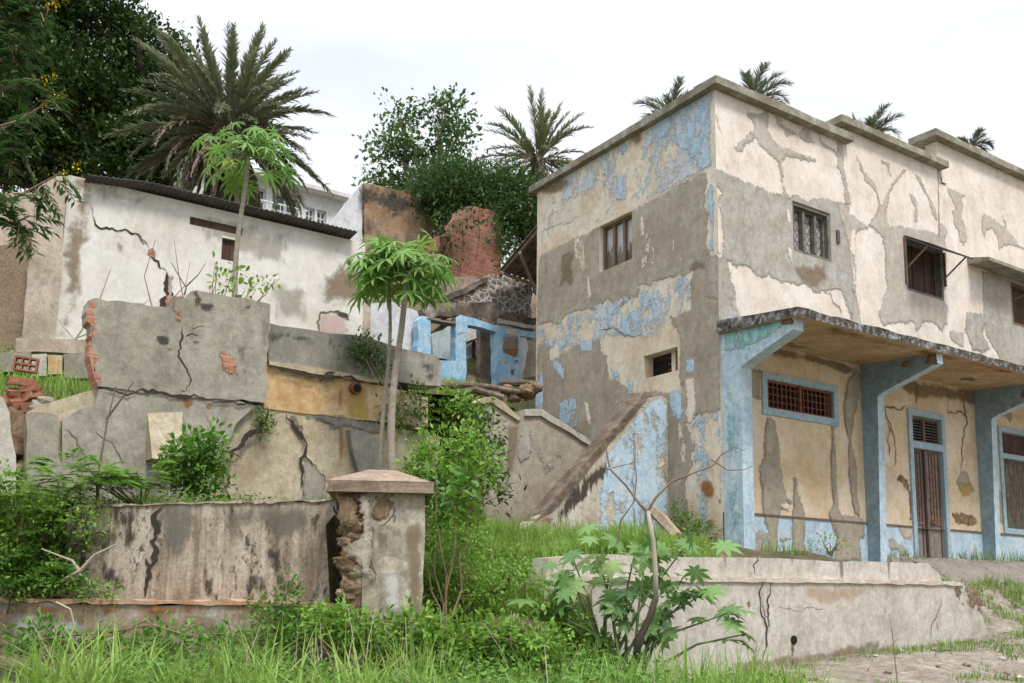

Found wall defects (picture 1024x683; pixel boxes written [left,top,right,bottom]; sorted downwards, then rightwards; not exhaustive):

water stain [359,186,430,217]
crack [92,209,174,308]
spalling [82,301,102,389]
flaking render [219,351,238,377]
peeling [536,111,1024,561]
crack [99,326,339,521]
crack [144,505,164,596]
spalling [335,492,361,527]
spalling [372,493,395,520]
crack [753,557,824,668]